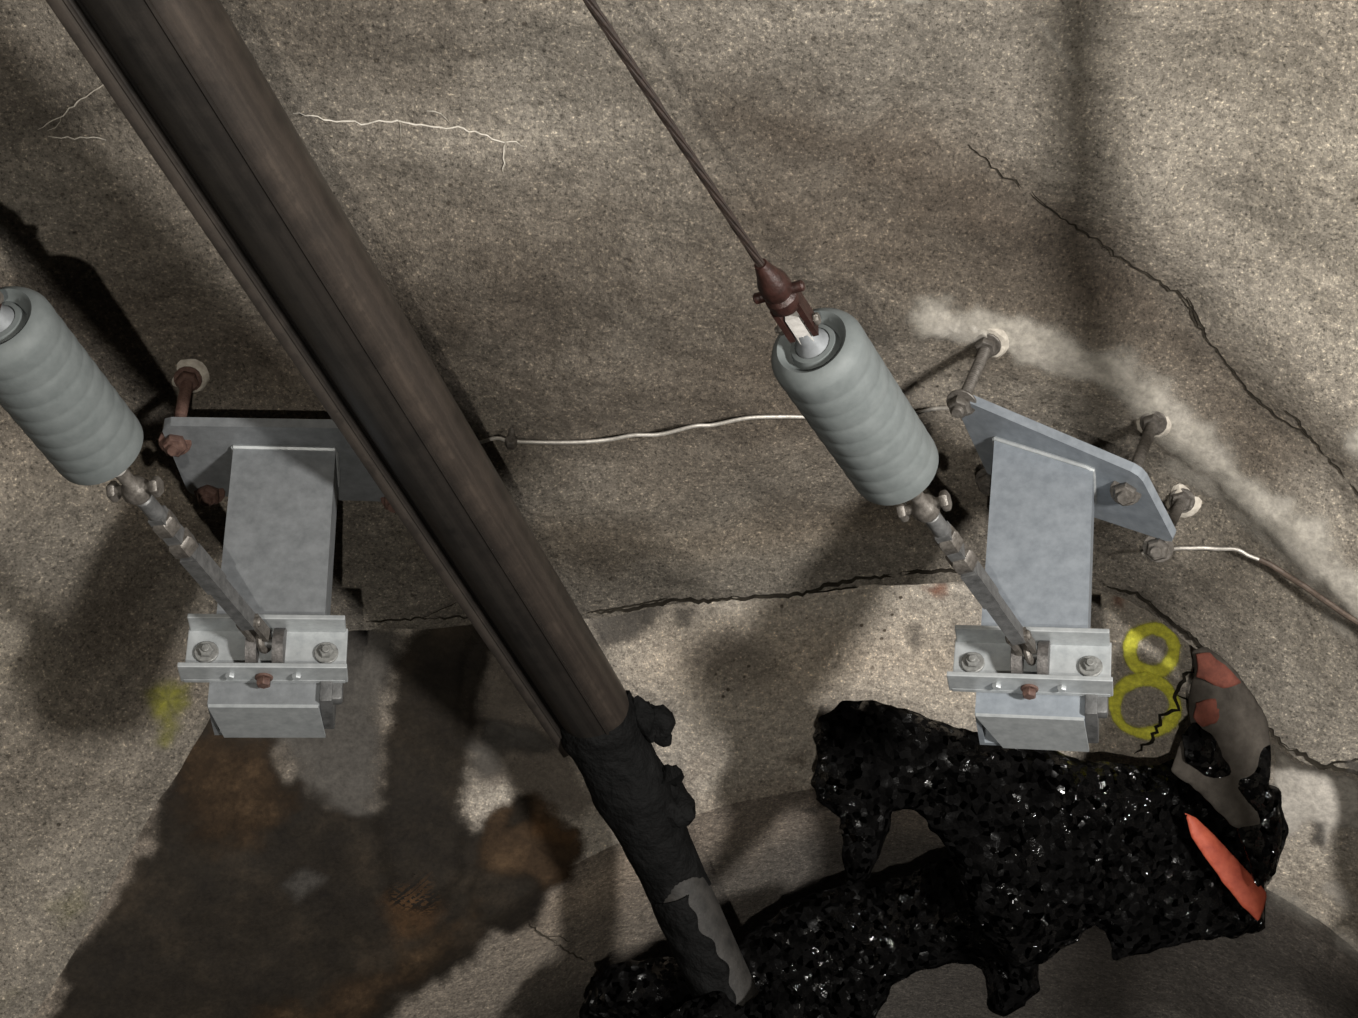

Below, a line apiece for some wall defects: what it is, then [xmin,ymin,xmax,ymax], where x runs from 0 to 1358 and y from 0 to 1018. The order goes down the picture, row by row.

crack [969,145,1358,495]
leakage [915,302,1358,619]
crack [366,603,468,623]
crack [588,568,957,614]
crack [1106,586,1203,754]
corrosion [471,794,583,933]